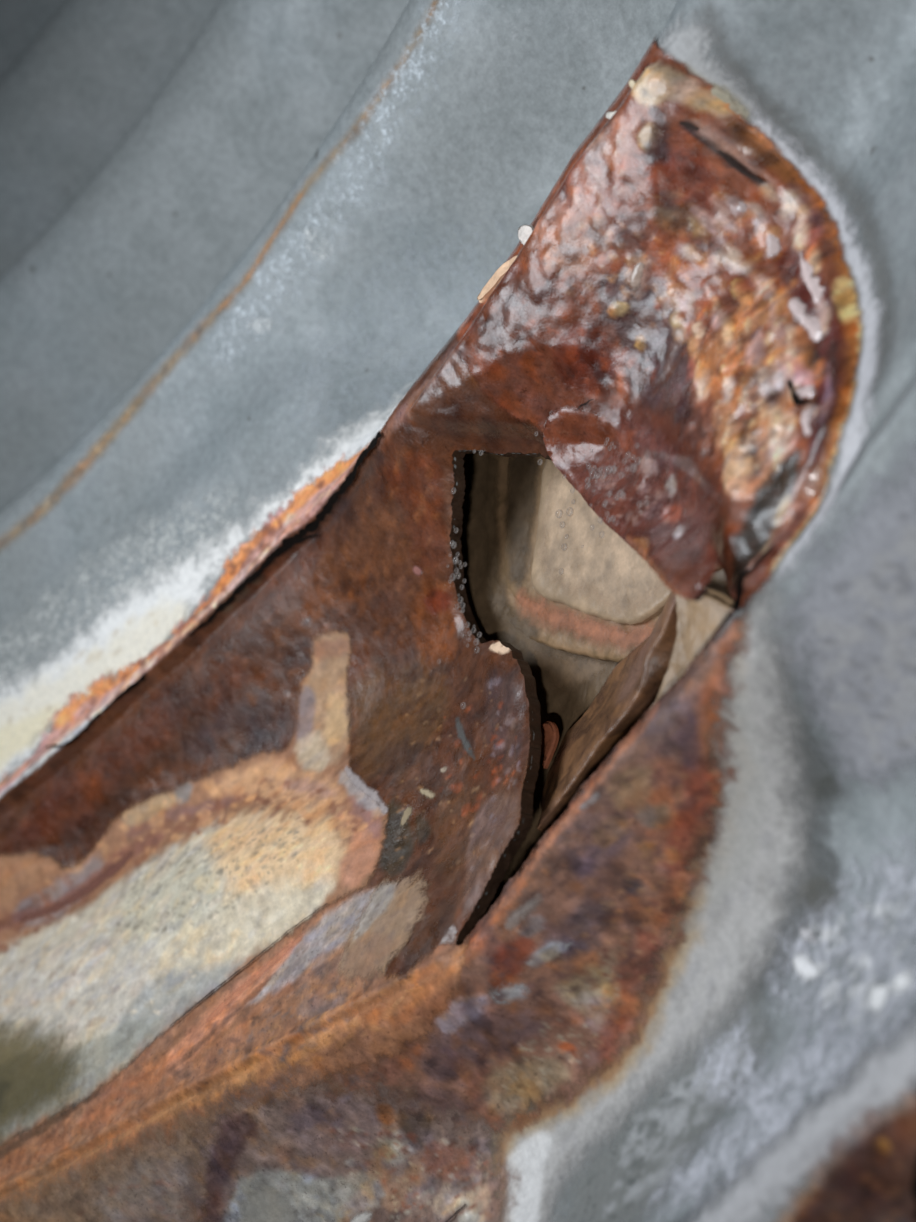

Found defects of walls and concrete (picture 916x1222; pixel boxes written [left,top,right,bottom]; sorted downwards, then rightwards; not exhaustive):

rust [477,255,518,304]
damp [0,395,405,781]
crack [189,432,381,636]
damp [484,15,916,1222]
crack [23,672,146,777]
rust [0,298,744,1222]
rust [780,1092,916,1222]